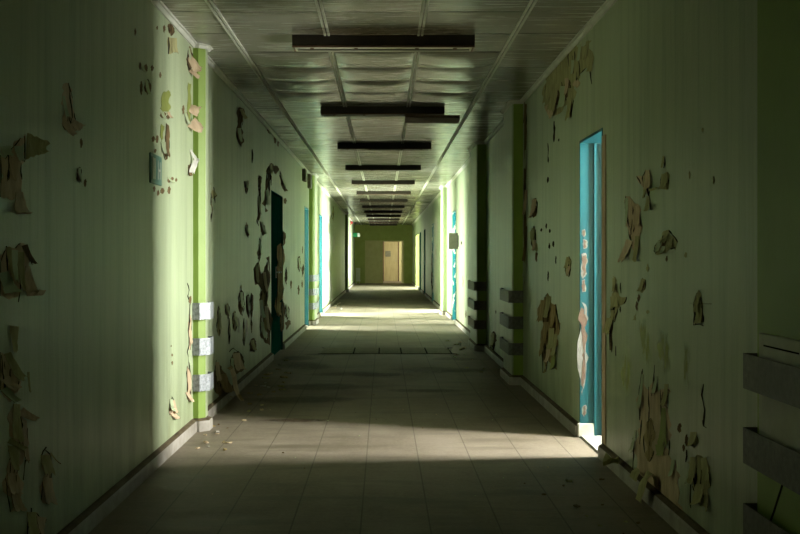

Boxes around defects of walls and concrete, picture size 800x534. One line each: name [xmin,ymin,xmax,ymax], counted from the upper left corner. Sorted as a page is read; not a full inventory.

peeling [152,90,173,160]
peeling [156,23,204,133]
peeling [188,150,199,176]
peeling [542,40,594,121]
peeling [0,243,46,302]
peeling [186,283,194,402]
peeling [213,163,304,398]
peeling [536,293,561,373]
peeling [577,302,589,393]
peeling [602,264,649,356]
peeling [0,325,39,512]
peeling [628,365,711,512]